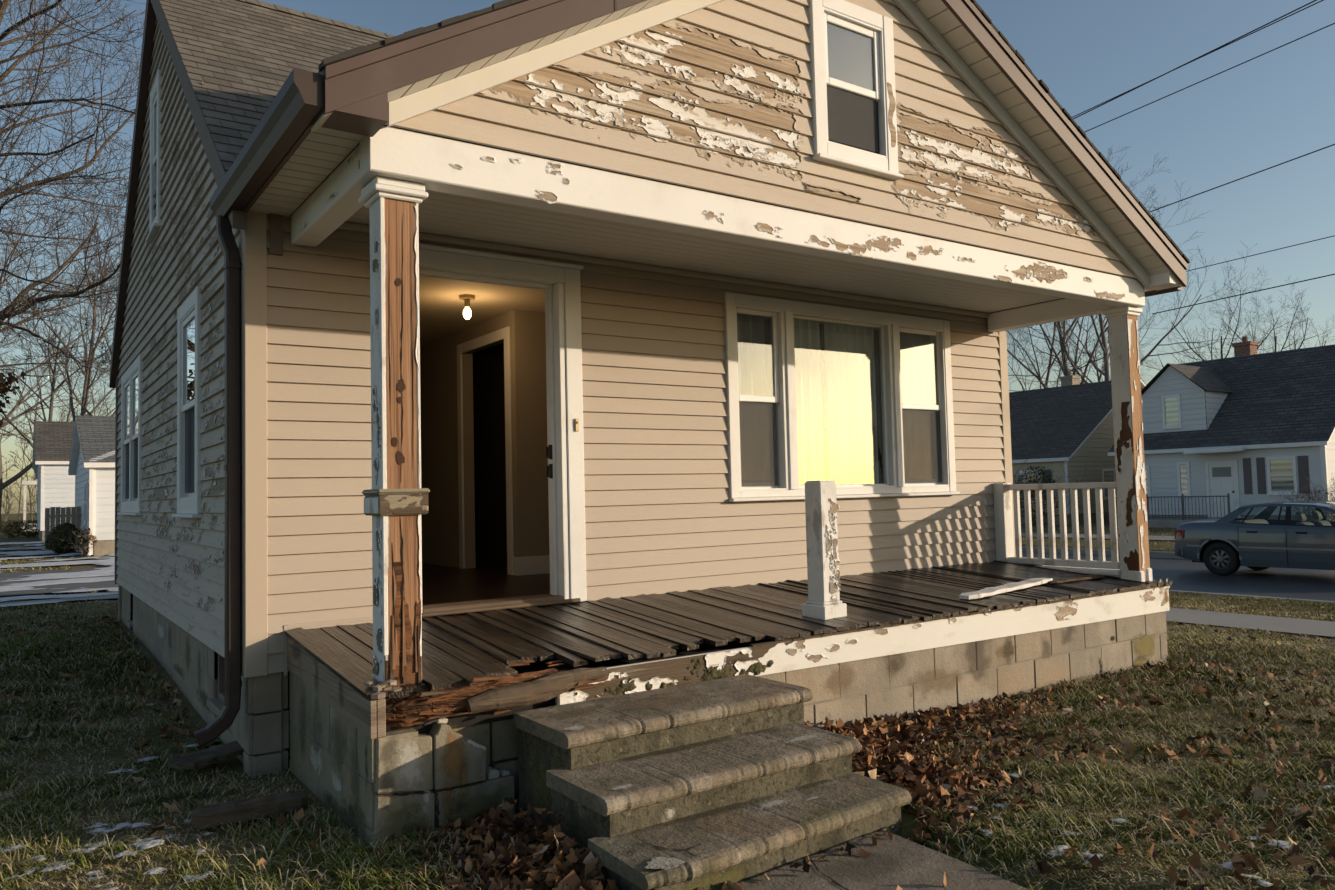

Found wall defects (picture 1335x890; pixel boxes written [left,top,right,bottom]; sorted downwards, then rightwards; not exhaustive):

peeling [479,22,862,204]
peeling [887,82,1100,236]
peeling [141,96,225,612]
peeling [371,231,386,364]
peeling [754,222,784,238]
peeling [806,234,976,263]
peeling [372,385,387,485]
peeling [1114,319,1147,571]
peeling [371,515,389,676]
peeling [558,637,859,705]
peeling [825,498,841,604]
peeling [1056,598,1079,621]